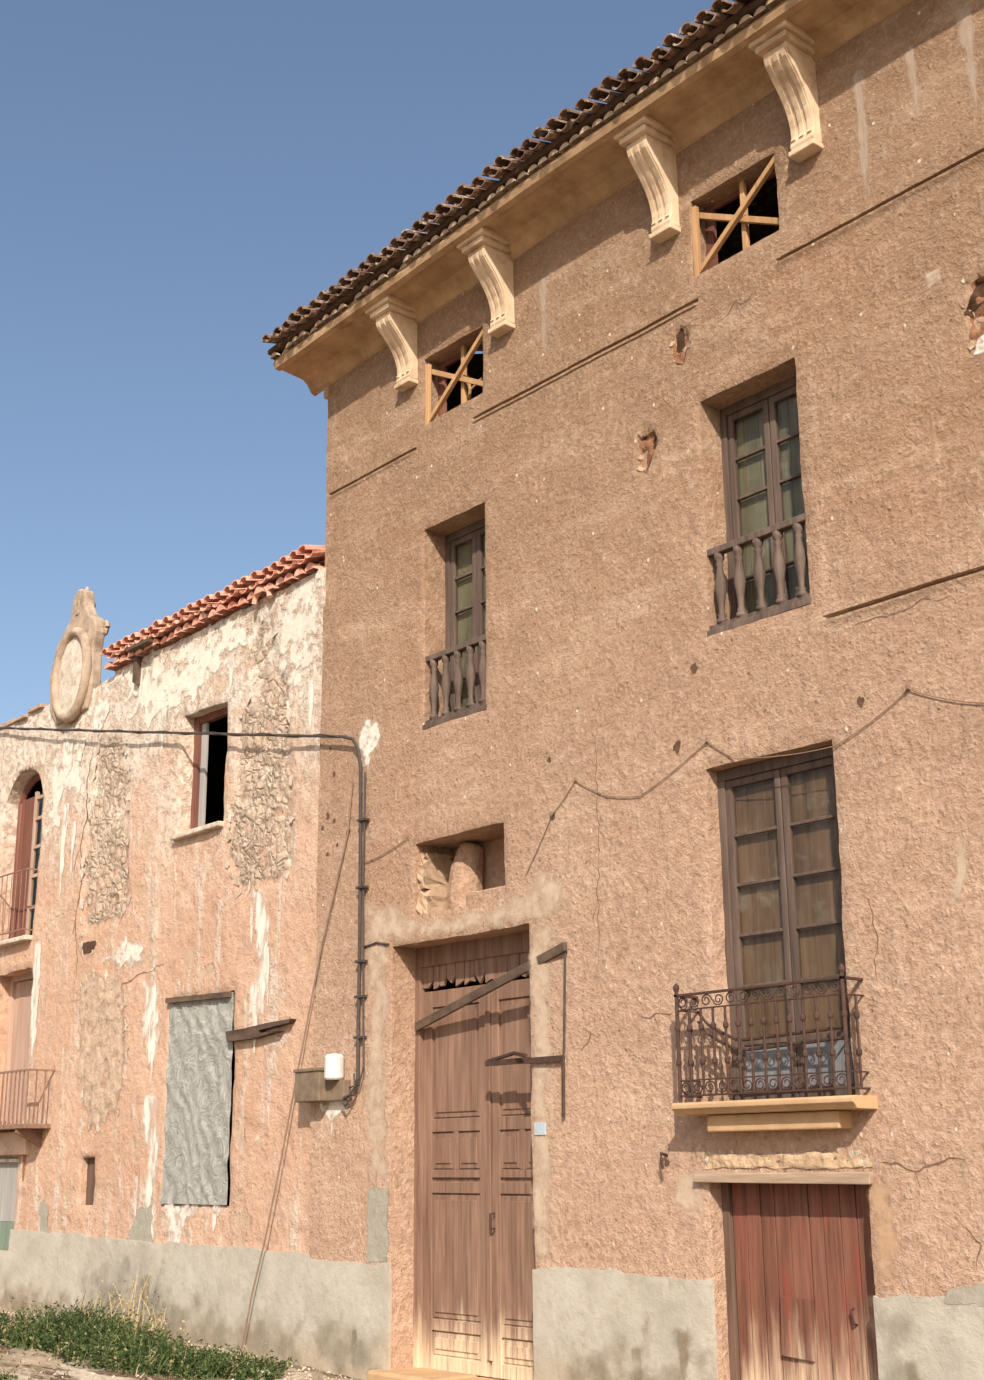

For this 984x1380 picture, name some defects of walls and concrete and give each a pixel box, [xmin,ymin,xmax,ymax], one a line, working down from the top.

spalling [670,325,692,365]
spalling [962,273,984,350]
spalling [637,429,657,473]
spalling [44,569,321,1132]
water stain [247,890,270,1054]
water stain [134,981,221,1243]
crack [753,1147,970,1187]